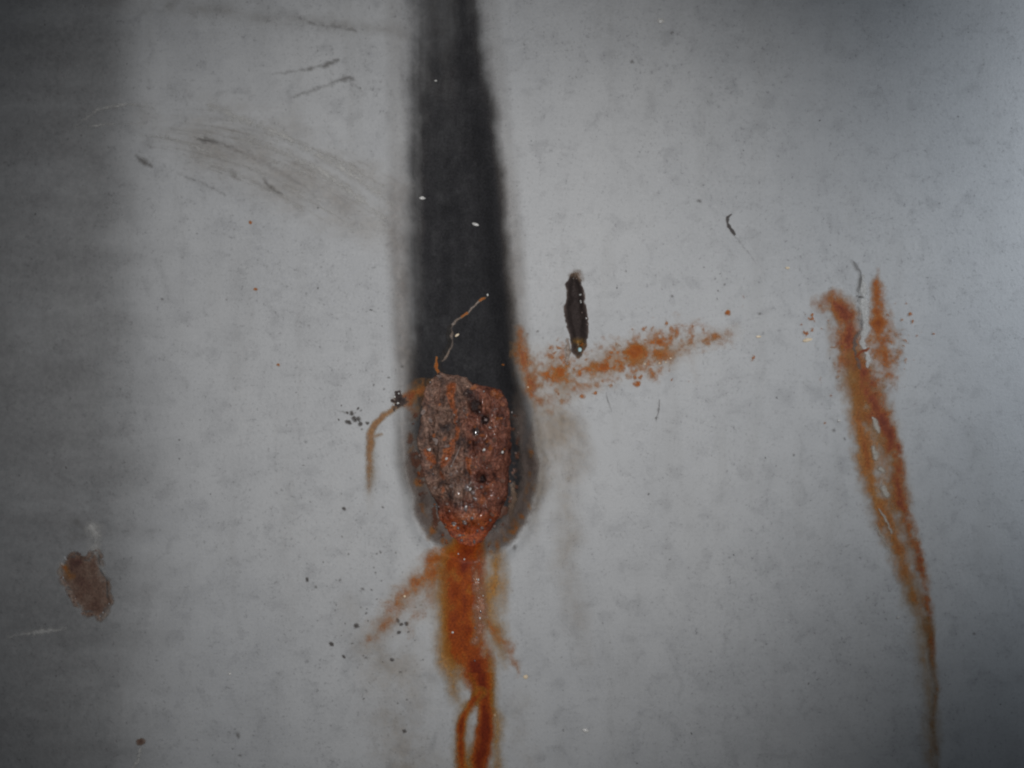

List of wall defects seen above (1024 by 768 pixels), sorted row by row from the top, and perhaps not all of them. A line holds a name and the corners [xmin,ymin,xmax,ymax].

corrosion [367,372,519,768]
water stain [401,0,539,556]
corrosion [514,322,717,403]
corrosion [801,278,939,733]